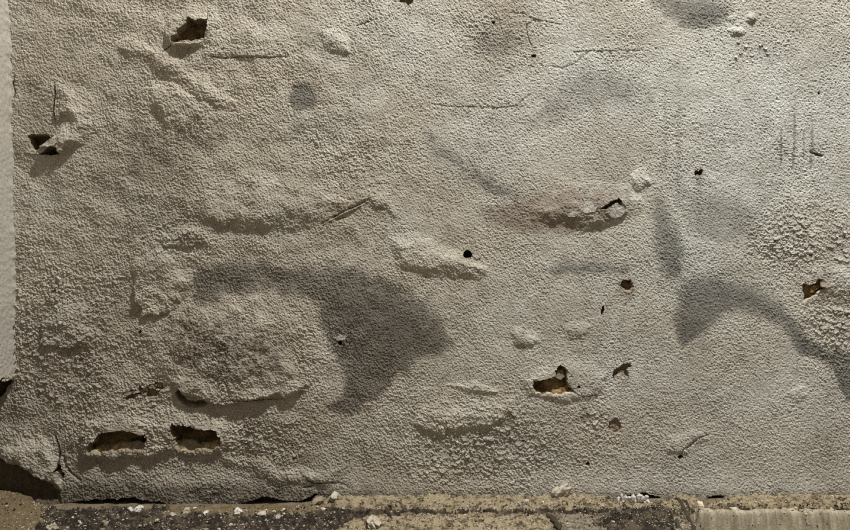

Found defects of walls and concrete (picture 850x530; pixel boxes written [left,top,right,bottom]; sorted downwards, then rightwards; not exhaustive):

spalling [170,16,207,46]
spalling [25,134,59,156]
spalling [567,196,628,218]
spalling [620,279,634,292]
spalling [802,279,833,305]
spalling [532,365,580,398]
spalling [612,363,631,380]
spalling [580,404,622,434]
spalling [86,426,147,457]
spalling [164,423,221,456]